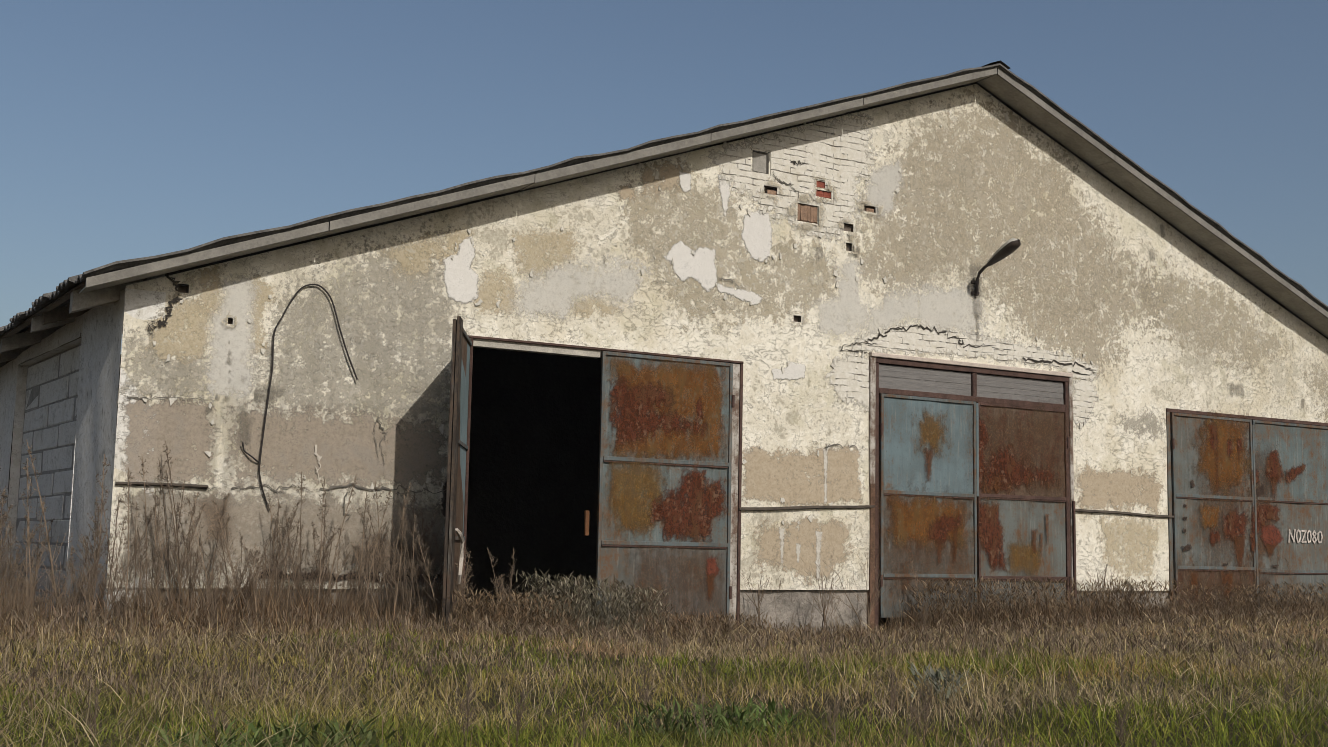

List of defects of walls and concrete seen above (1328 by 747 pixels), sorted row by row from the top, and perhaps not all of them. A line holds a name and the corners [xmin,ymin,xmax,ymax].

crack [148,270,183,337]
peeling [617,88,1165,429]
rust [607,359,727,542]
rust [912,408,948,479]
rust [926,418,1060,575]
rust [1182,424,1306,572]